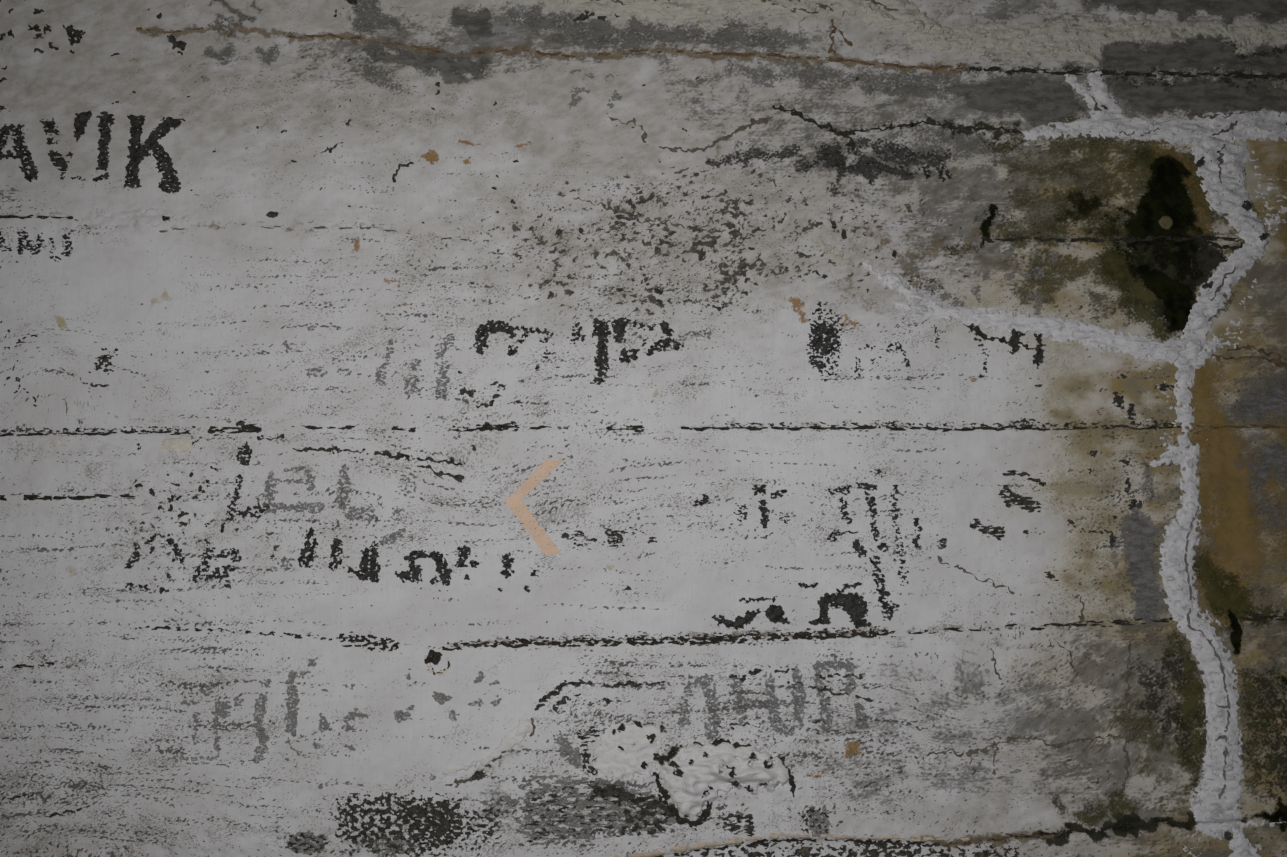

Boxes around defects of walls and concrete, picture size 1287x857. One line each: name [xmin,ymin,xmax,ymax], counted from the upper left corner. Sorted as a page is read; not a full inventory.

peeling [908,246,1058,315]
crack [981,232,1245,321]
crack [1211,344,1287,369]
peeling [393,705,414,723]
peeling [432,671,502,720]
spalling [284,726,1072,857]